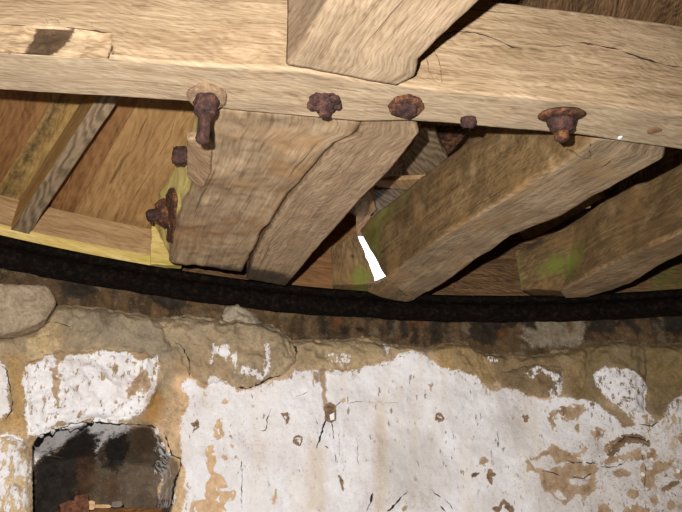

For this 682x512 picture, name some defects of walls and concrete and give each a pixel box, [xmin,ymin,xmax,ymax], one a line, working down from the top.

damp [469,322,515,345]
damp [521,321,585,348]
crack [316,401,395,461]
peeling [547,403,586,433]
peeling [190,418,236,512]
peeling [522,427,682,512]